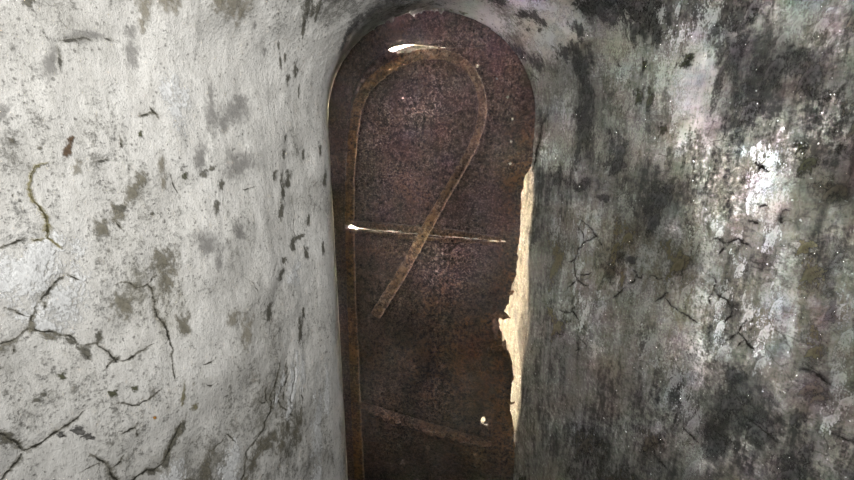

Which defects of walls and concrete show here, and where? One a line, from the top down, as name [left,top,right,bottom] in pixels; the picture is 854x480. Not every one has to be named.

leakage [539,0,662,204]
leakage [708,0,854,209]
crack [0,163,62,249]
leakage [528,224,540,246]
crack [569,221,603,287]
leakage [598,181,693,293]
crack [0,411,83,480]
crack [0,274,175,437]
crack [79,423,181,480]
crack [212,360,303,480]
corrosion [491,311,511,320]
leakage [703,280,837,480]